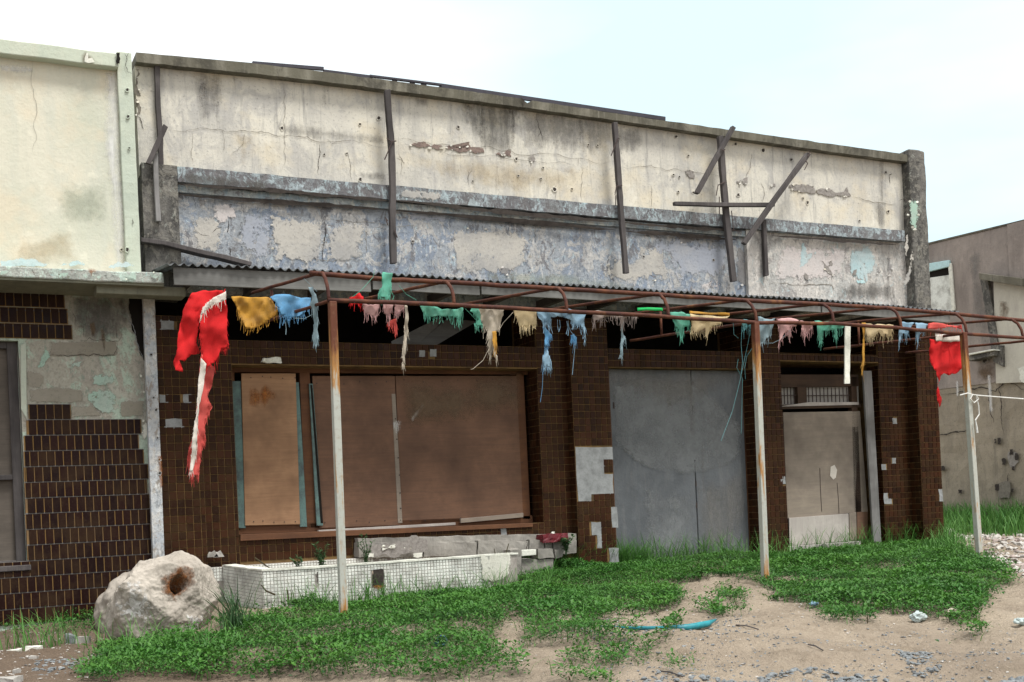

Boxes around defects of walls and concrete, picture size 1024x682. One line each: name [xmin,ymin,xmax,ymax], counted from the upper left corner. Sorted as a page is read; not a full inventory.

crack [174,88,594,200]
spalling [409,142,484,154]
spalling [789,183,851,205]
peeling [192,204,367,263]
peeling [452,227,532,276]
peeling [603,237,746,289]
peeling [776,243,894,283]
peeling [903,200,920,285]
spalling [129,299,153,360]
peeling [27,349,115,417]
peeling [575,447,614,501]
peeling [591,507,619,563]